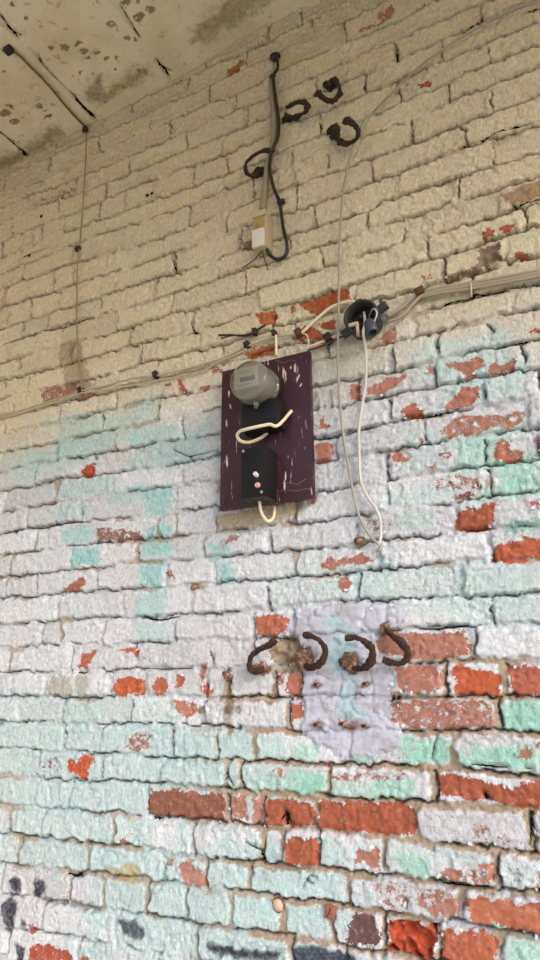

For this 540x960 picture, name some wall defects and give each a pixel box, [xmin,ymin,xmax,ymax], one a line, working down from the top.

crack [0,14,96,119]
spalling [420,224,530,282]
peeling [349,374,406,402]
peeling [401,403,424,421]
peeling [425,356,525,464]
peeling [427,451,500,533]
peeling [490,535,540,565]
peeling [113,673,197,719]
peeling [435,773,540,811]
peeling [147,787,419,871]
peeling [165,857,212,892]
peeling [345,863,540,960]